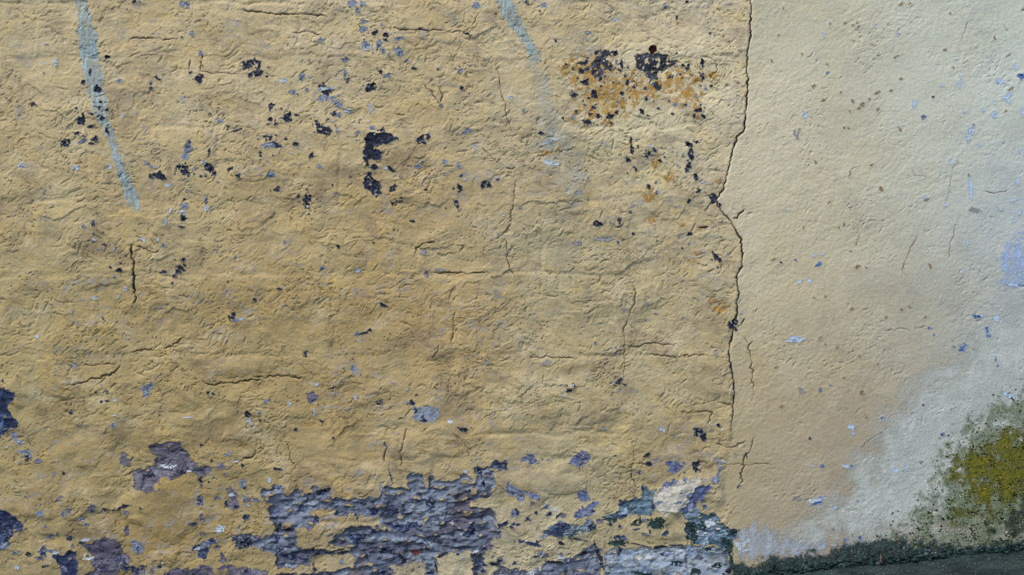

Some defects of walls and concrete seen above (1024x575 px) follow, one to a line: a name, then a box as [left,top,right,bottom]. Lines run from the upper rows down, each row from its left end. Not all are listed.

peeling [241,56,403,205]
peeling [561,48,713,126]
crack [130,245,158,303]
peeling [293,188,312,215]
crack [530,0,769,484]
peeling [0,379,42,464]
peeling [0,441,752,575]
water stain [729,310,1024,575]